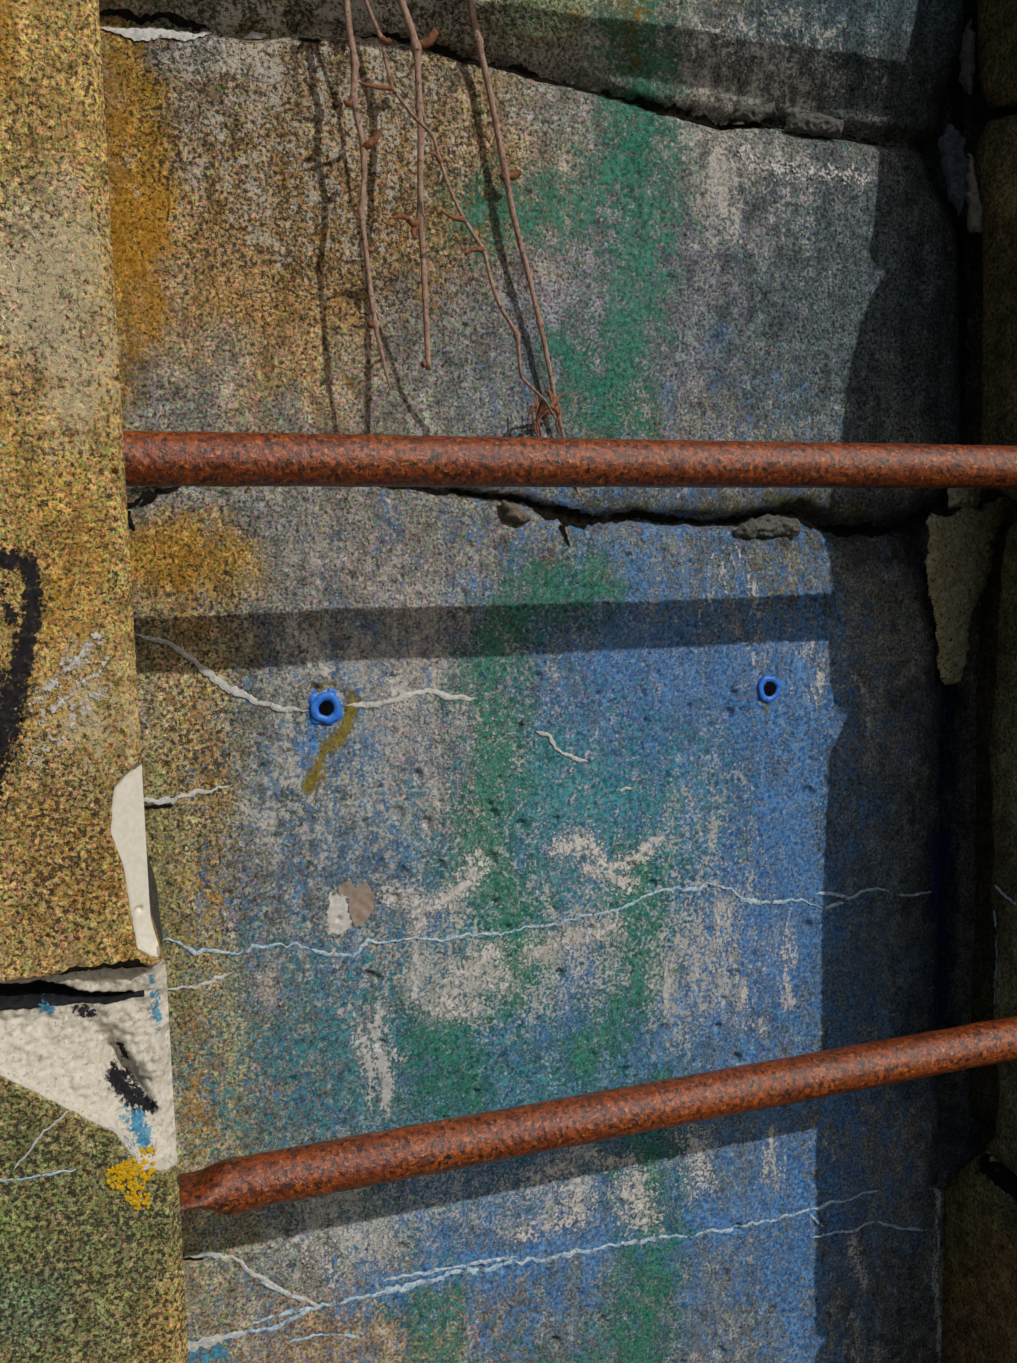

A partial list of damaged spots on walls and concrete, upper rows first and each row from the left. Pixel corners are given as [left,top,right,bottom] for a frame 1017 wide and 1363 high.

crack [99,8,211,41]
crack [243,31,322,43]
crack [356,32,895,147]
crack [127,486,181,531]
crack [381,486,908,546]
peeling [947,488,981,508]
crack [134,633,309,713]
crack [345,688,477,709]
crack [995,885,1017,905]
spalling [0,763,178,1171]
crack [0,882,932,1011]
crack [183,1186,926,1352]